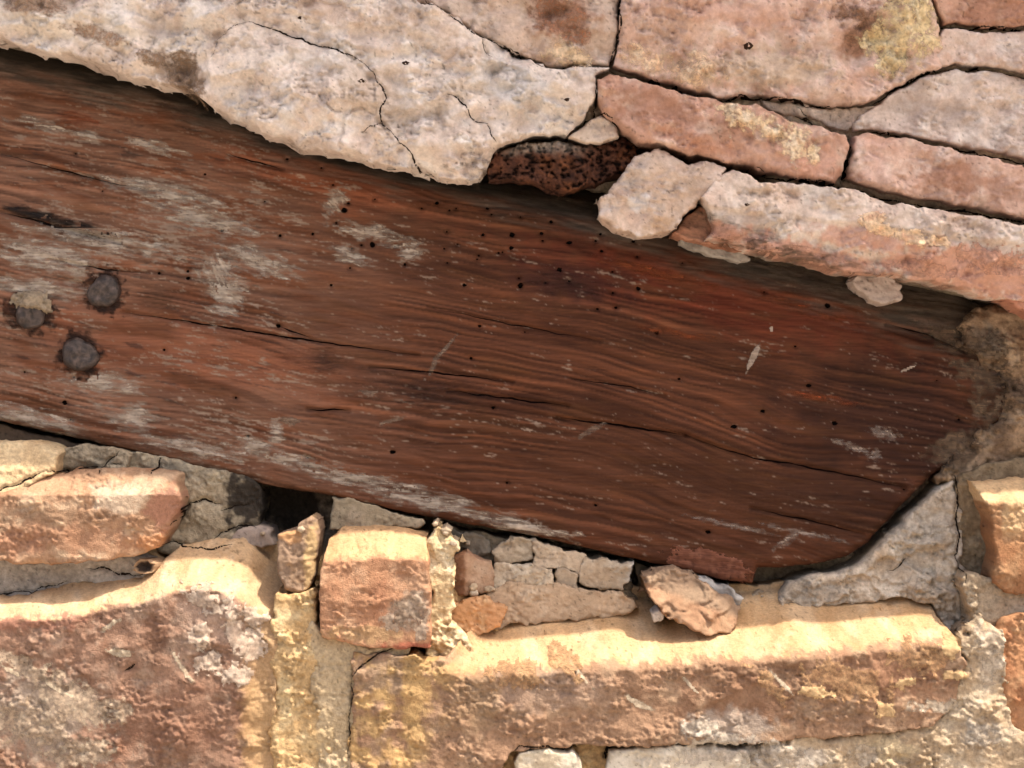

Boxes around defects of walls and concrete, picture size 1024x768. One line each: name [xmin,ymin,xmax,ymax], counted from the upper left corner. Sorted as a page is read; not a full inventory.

crack [213,21,430,183]
corrosion [2,300,60,337]
corrosion [55,329,104,380]
corrosion [81,268,128,318]
crack [131,309,904,488]
crack [954,476,967,583]